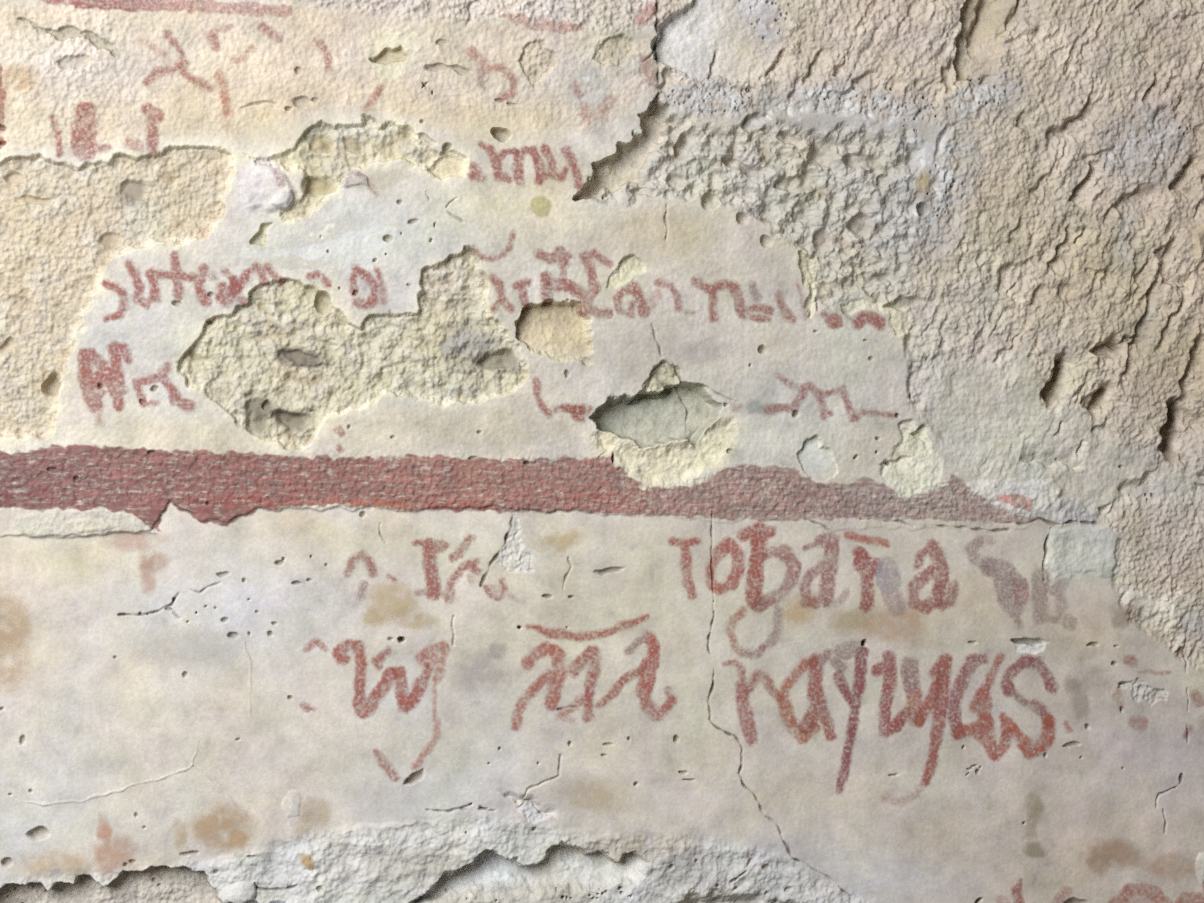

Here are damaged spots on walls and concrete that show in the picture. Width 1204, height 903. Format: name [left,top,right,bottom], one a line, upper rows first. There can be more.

crack [652,0,660,97]
spalling [571,91,935,339]
spalling [0,111,473,442]
spalling [172,243,595,454]
spalling [585,356,744,492]
spalling [874,413,946,501]
spalling [1039,349,1125,422]
spalling [1157,330,1204,465]
peeling [963,475,1122,582]
spalling [0,850,222,903]
spalling [407,837,654,903]
spalling [669,857,835,903]